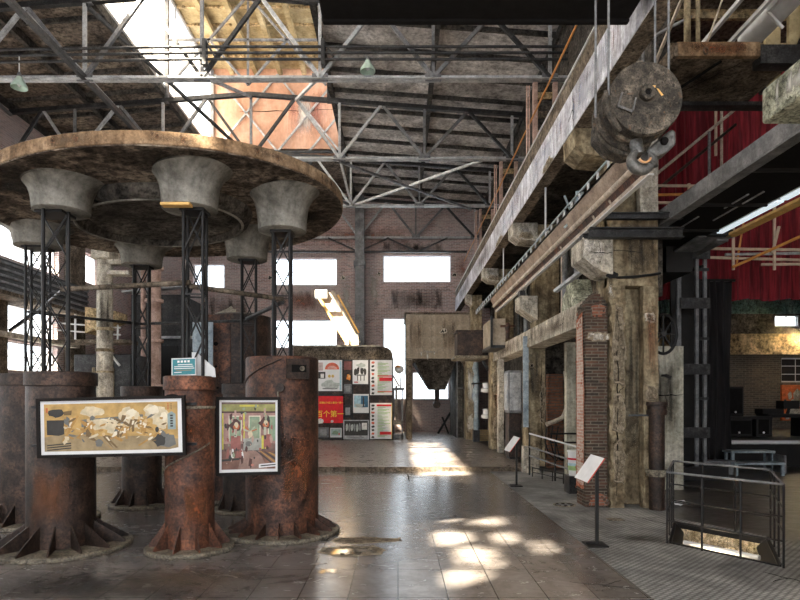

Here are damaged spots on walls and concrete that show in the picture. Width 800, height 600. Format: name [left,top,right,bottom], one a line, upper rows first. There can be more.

peeling [575,300,627,506]
crack [613,309,697,530]